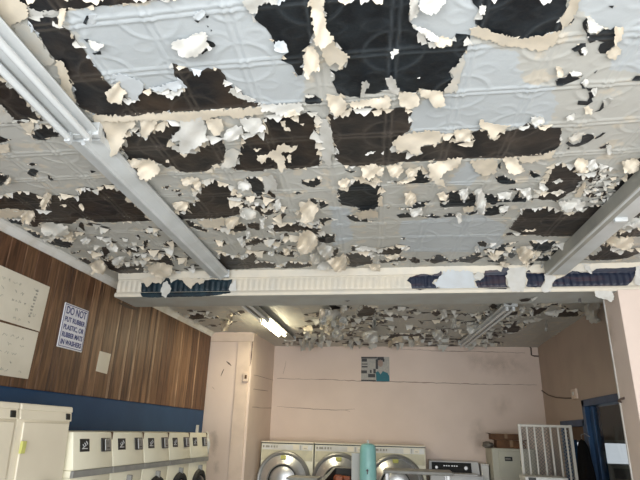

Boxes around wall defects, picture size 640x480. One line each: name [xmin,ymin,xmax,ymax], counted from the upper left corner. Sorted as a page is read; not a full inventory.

peeling [0,0,640,352]
crack [302,377,434,385]